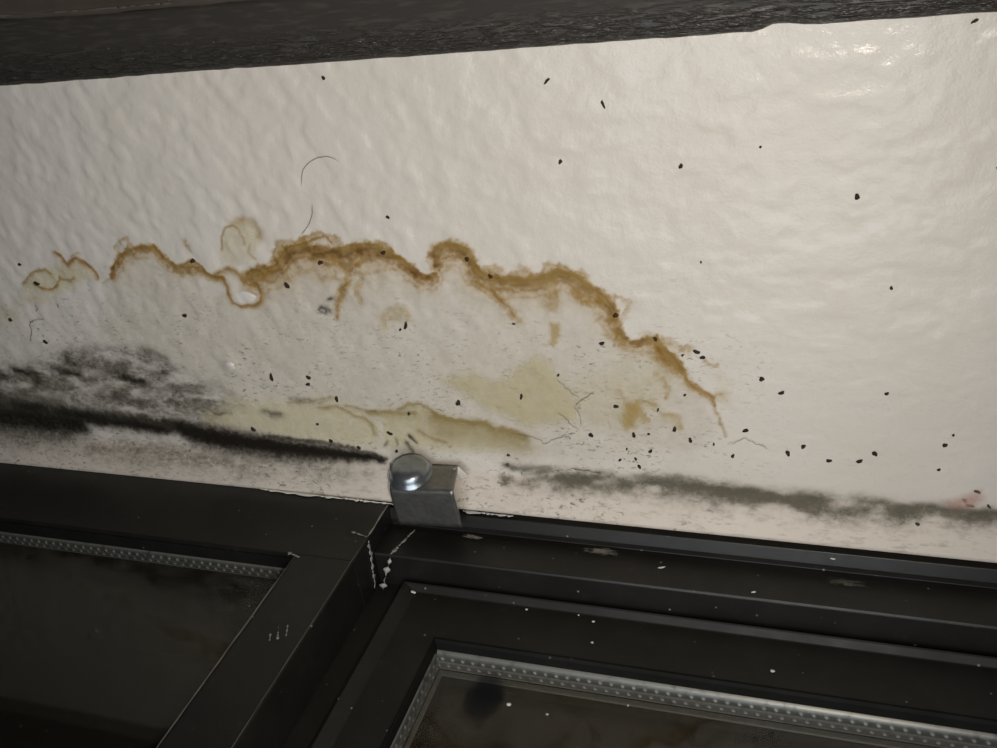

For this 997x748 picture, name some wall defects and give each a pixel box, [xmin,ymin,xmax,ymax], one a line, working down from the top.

water stain [54,233,715,406]
water stain [0,349,387,471]
water stain [366,403,527,440]
water stain [502,464,997,524]